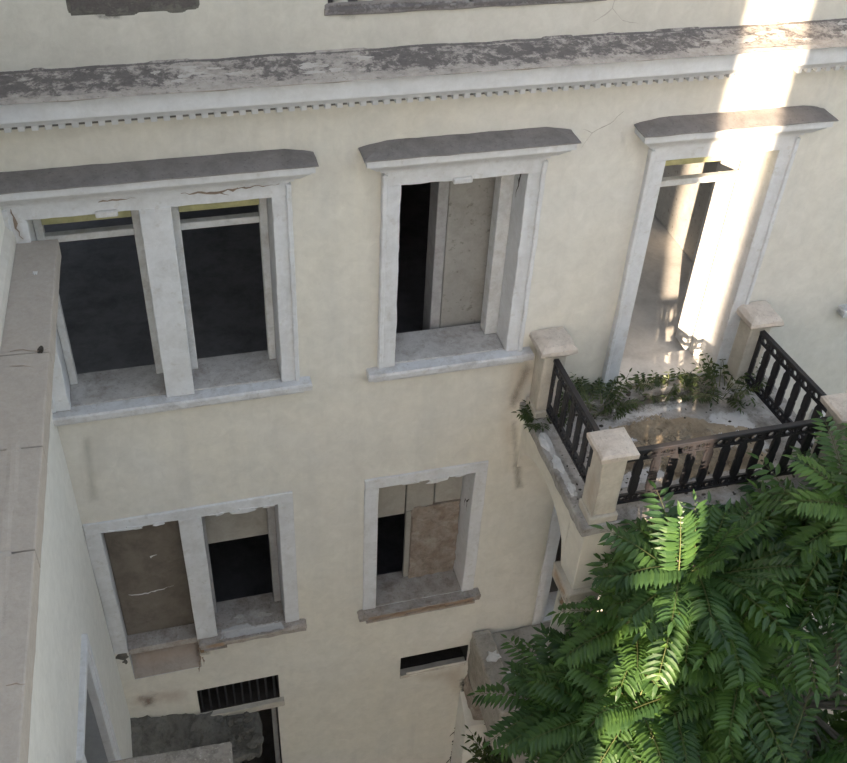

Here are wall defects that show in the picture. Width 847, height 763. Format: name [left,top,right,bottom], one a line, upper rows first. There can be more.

peeling [735,29,784,43]
peeling [171,65,245,83]
peeling [299,62,342,74]
peeling [181,184,278,195]
spalling [208,504,275,516]